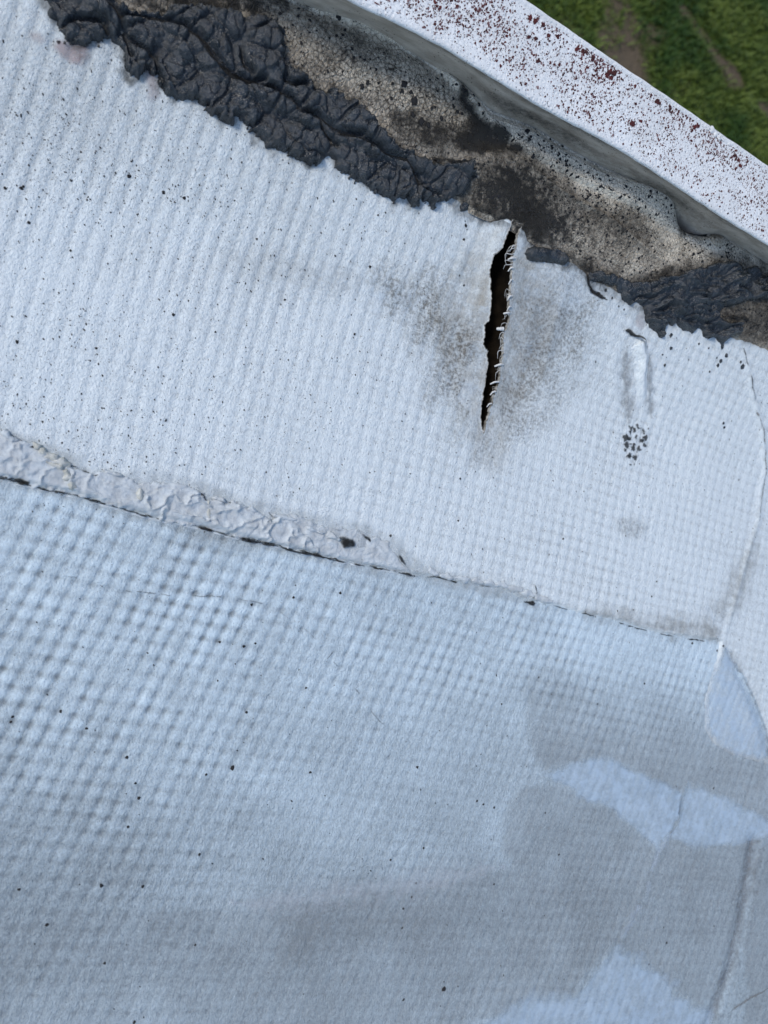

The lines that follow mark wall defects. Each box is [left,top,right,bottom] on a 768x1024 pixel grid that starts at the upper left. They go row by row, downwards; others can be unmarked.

crack [62,1,476,185]
leakage [553,760,768,843]
leakage [492,955,709,1024]